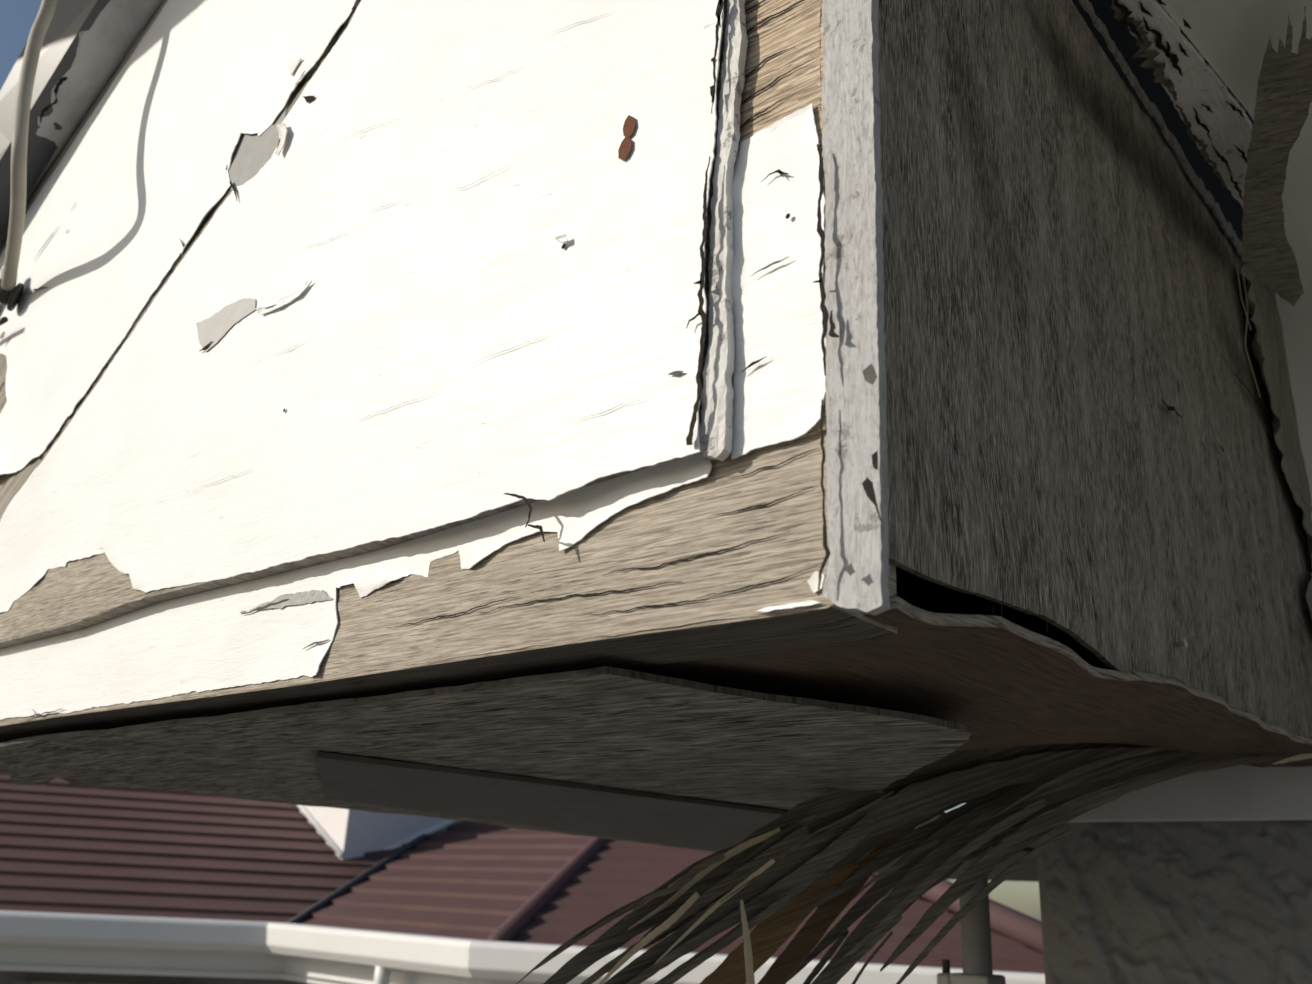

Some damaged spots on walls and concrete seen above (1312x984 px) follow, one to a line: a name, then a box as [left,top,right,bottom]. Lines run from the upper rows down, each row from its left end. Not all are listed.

crack [272,0,358,124]
crack [710,0,724,114]
peeling [226,109,288,200]
rust [618,115,635,160]
peeling [1111,0,1312,306]
peeling [0,331,11,413]
crack [40,185,231,459]
crack [686,156,711,445]
peeling [0,448,51,520]
peeling [0,553,147,640]
crack [504,493,545,542]
peeling [240,432,855,679]